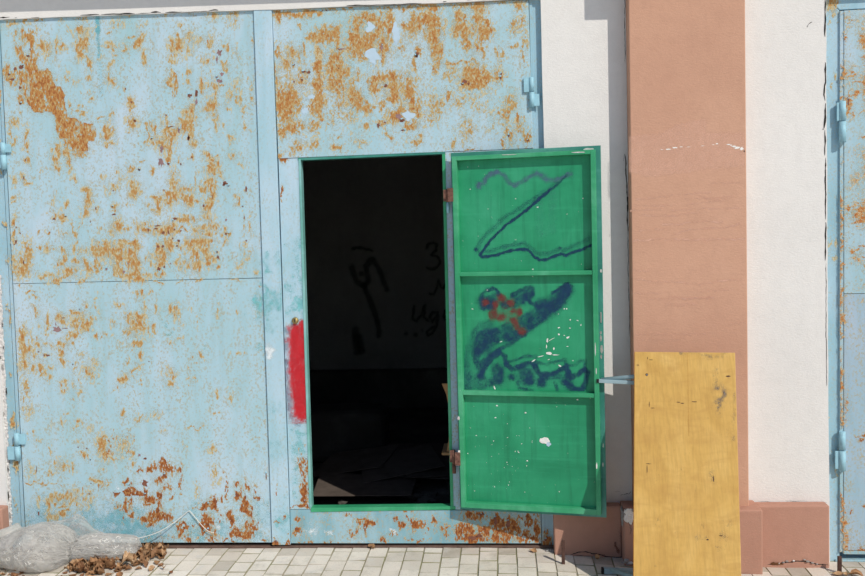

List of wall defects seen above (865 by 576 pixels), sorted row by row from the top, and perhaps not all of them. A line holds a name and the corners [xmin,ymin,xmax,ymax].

rust [272,0,533,167]
rust [826,0,865,122]
rust [0,11,313,545]
rust [828,136,865,428]
rust [345,510,554,545]
rust [840,488,865,555]